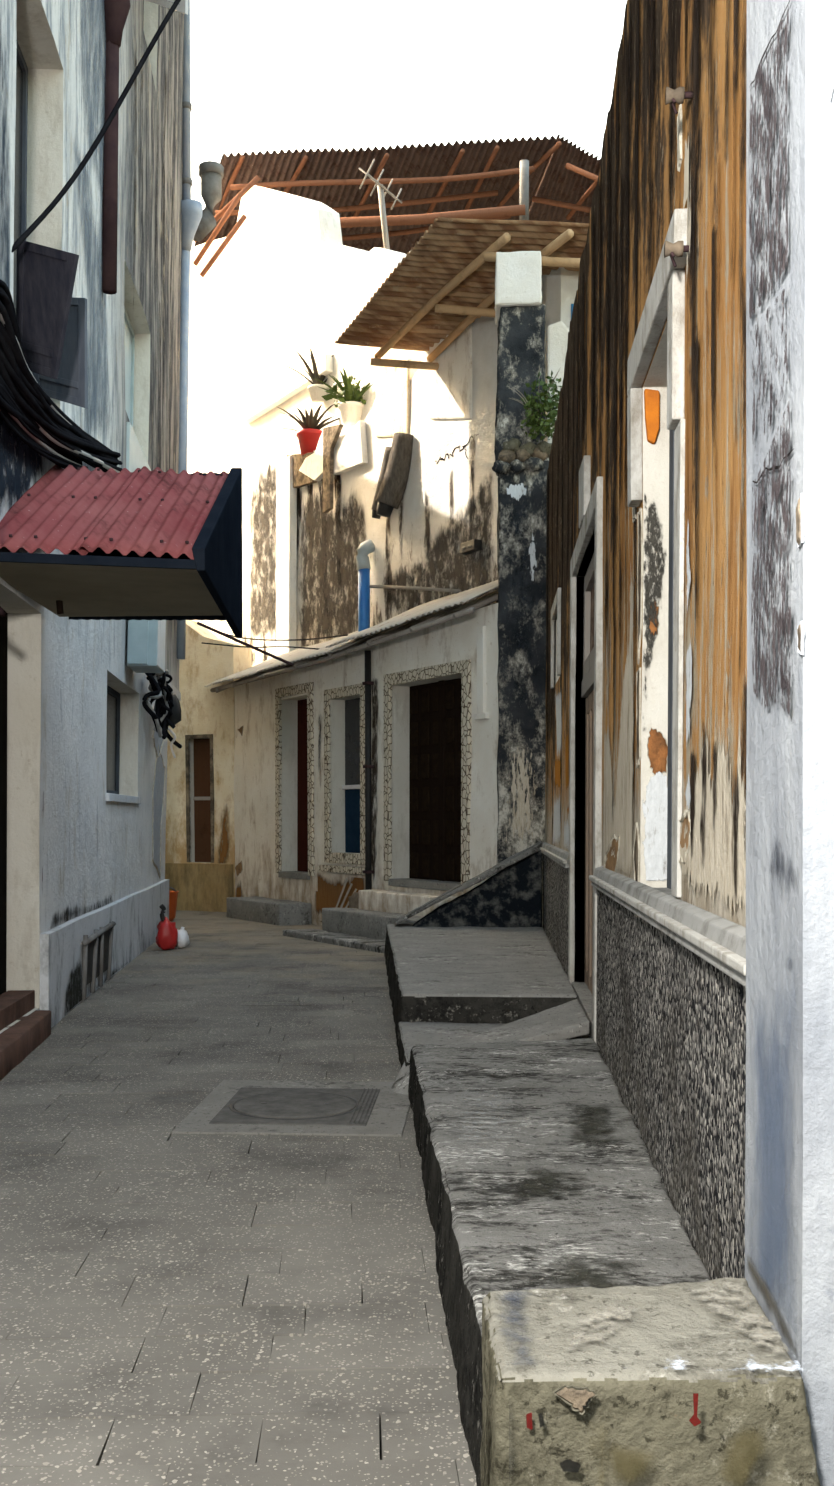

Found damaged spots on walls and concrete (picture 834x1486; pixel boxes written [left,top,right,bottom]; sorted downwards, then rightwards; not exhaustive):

damp [509,0,746,789]
damp [248,463,276,637]
damp [297,475,366,639]
damp [386,439,492,615]
damp [690,647,747,896]